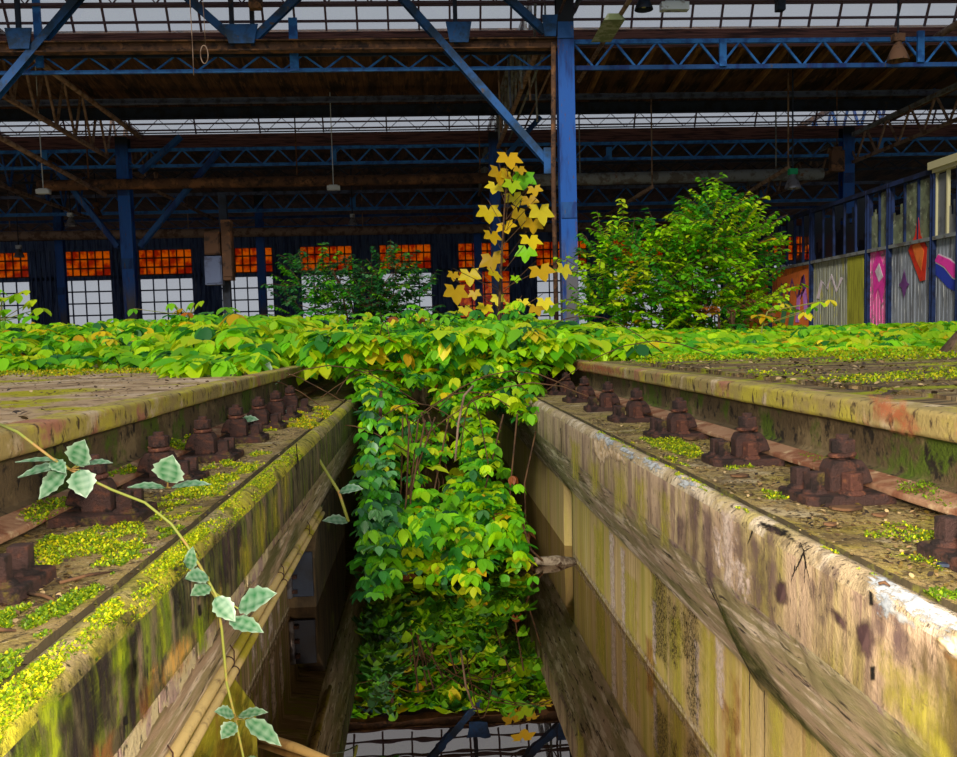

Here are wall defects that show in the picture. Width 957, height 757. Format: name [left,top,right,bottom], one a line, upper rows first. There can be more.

crack [791,542,814,583]
leakage [574,530,724,757]
leakage [857,605,880,657]
leakage [894,619,904,653]
leakage [21,617,139,757]
leakage [907,654,957,757]
leakage [193,736,253,757]